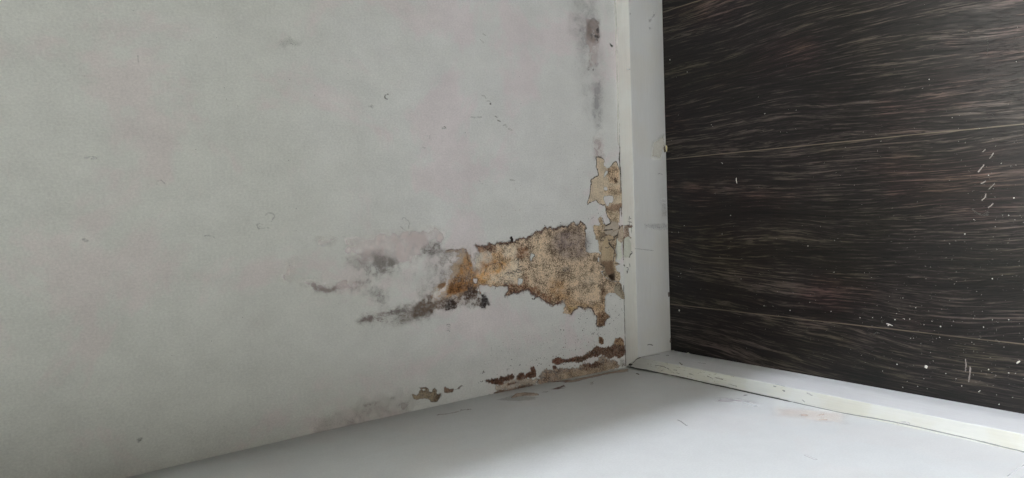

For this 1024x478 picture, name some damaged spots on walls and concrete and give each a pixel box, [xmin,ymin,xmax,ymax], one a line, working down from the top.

damp [576,1,602,126]
damp [305,233,489,325]
peeling [469,156,632,335]
peeling [412,385,462,402]